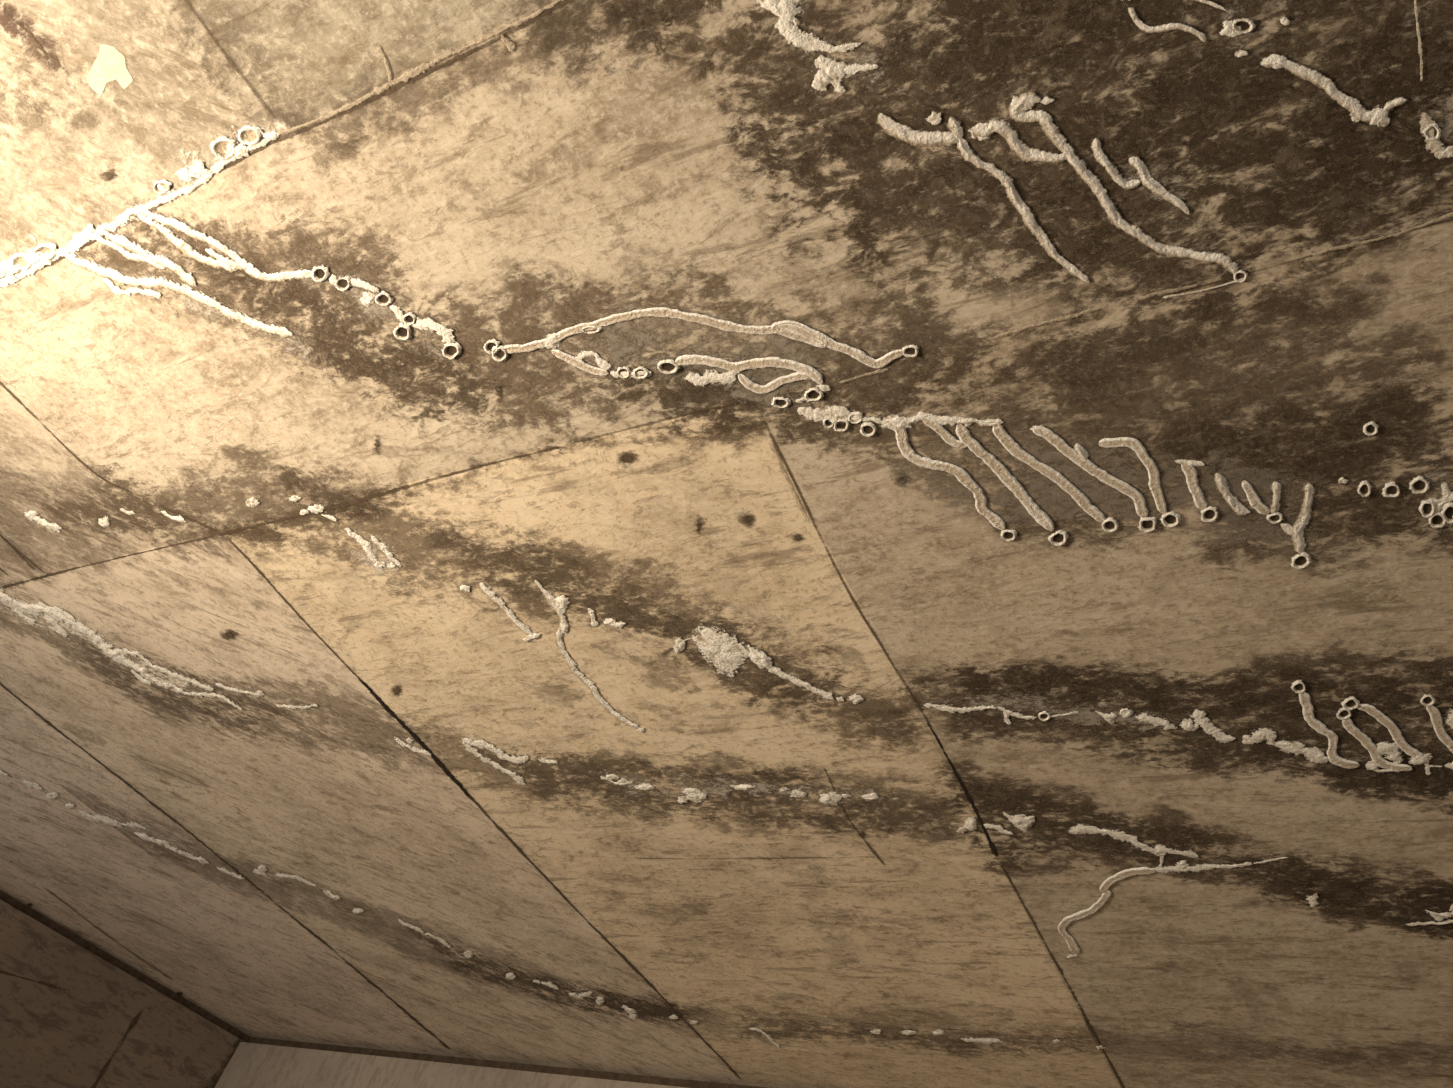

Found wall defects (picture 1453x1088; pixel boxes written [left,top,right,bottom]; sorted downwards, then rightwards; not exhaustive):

water stain [0,0,1453,576]
water stain [0,447,1453,802]
water stain [0,770,364,914]
water stain [398,919,473,959]
water stain [939,760,1453,958]